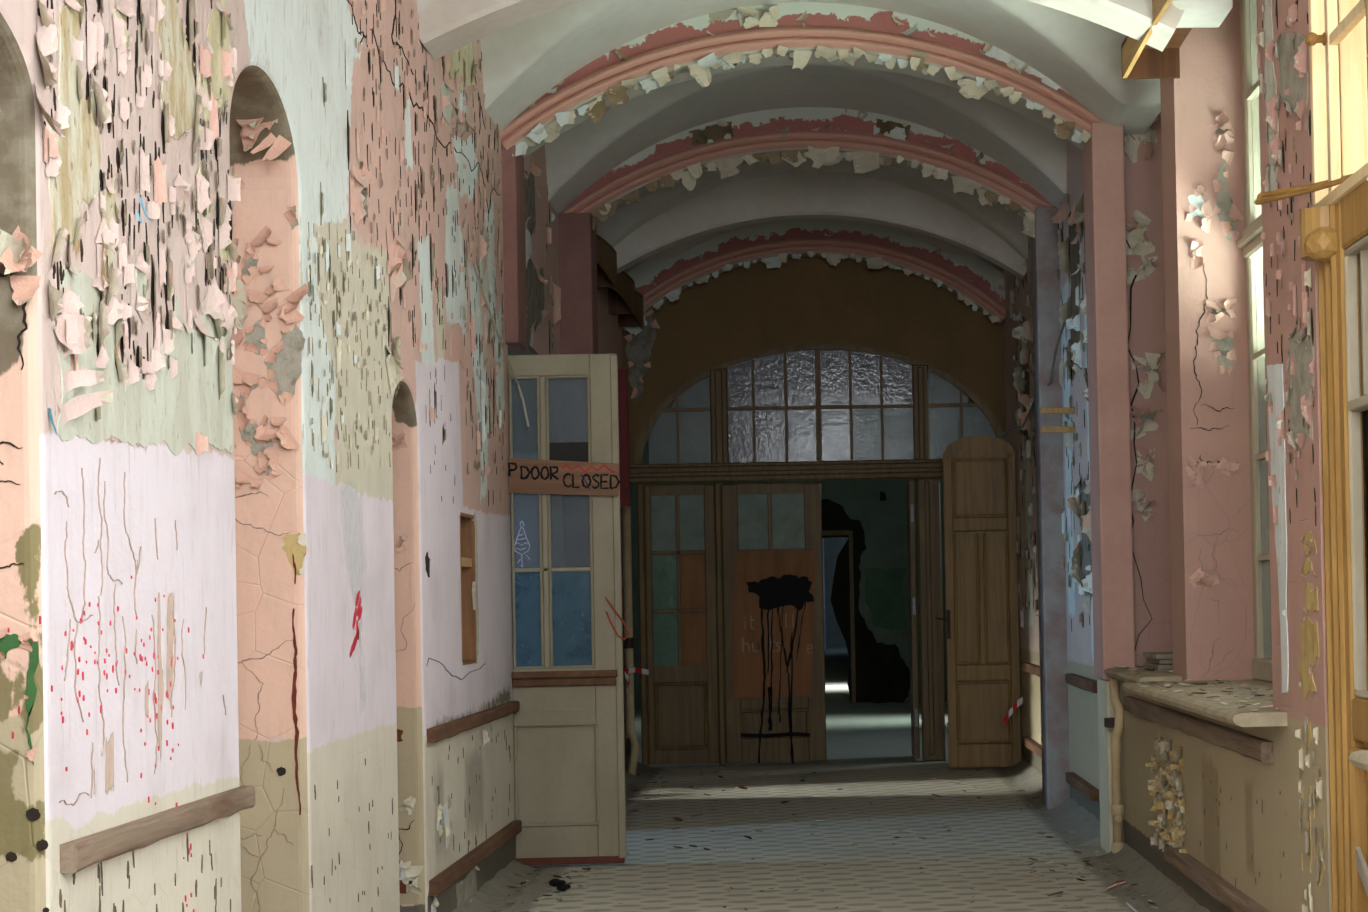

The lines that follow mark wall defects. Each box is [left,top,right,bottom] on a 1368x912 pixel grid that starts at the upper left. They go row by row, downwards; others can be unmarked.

crack [347,0,498,212]
crack [0,441,22,485]
crack [0,273,28,370]
crack [235,492,290,536]
peeling [0,0,1093,664]
crack [1190,267,1238,463]
peeling [1205,298,1237,375]
peeling [1256,0,1316,526]
peeling [0,627,40,766]
crack [54,458,207,806]
crack [223,636,296,912]
peeling [1146,731,1201,854]